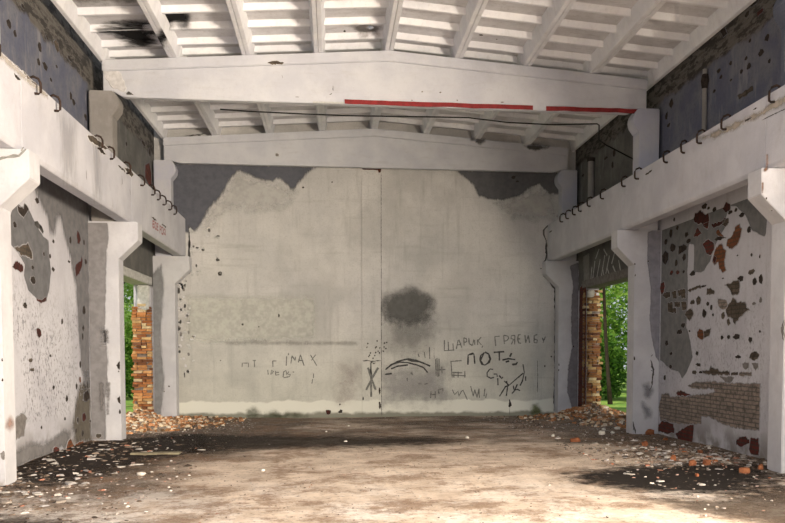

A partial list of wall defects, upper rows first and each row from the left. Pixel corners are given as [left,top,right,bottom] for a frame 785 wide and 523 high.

peeling [11,197,55,303]
spalling [647,202,763,456]
spalling [15,413,27,440]